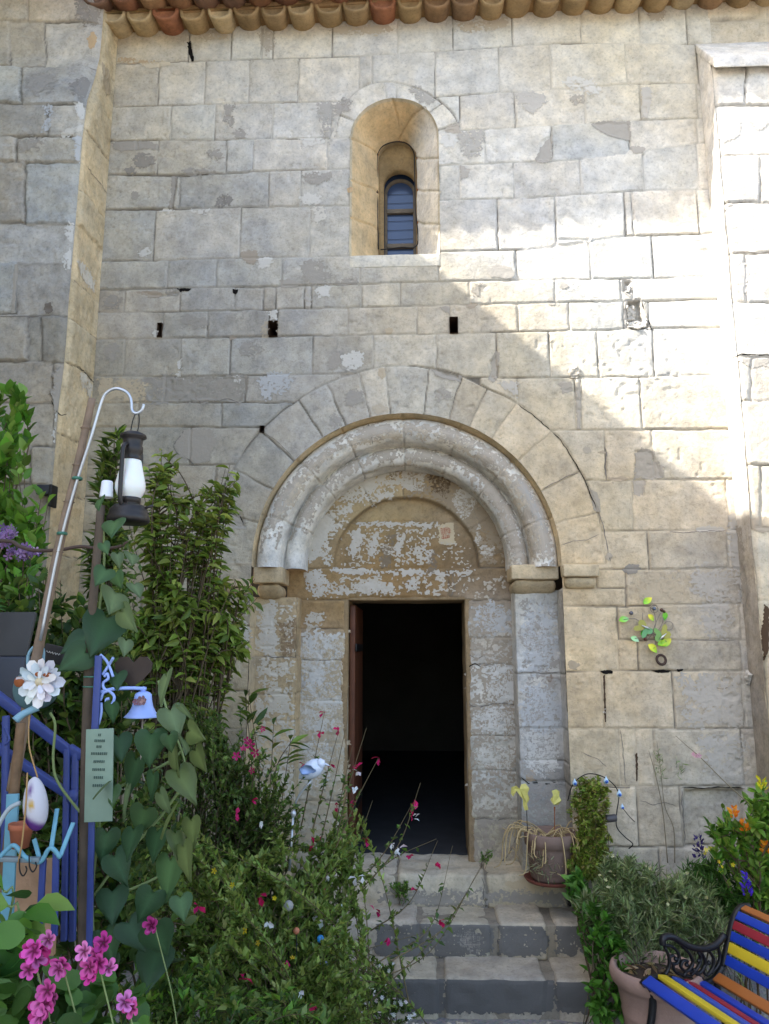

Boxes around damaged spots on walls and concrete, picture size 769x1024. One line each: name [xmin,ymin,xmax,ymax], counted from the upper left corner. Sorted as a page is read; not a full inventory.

peeling [254,421,580,862]